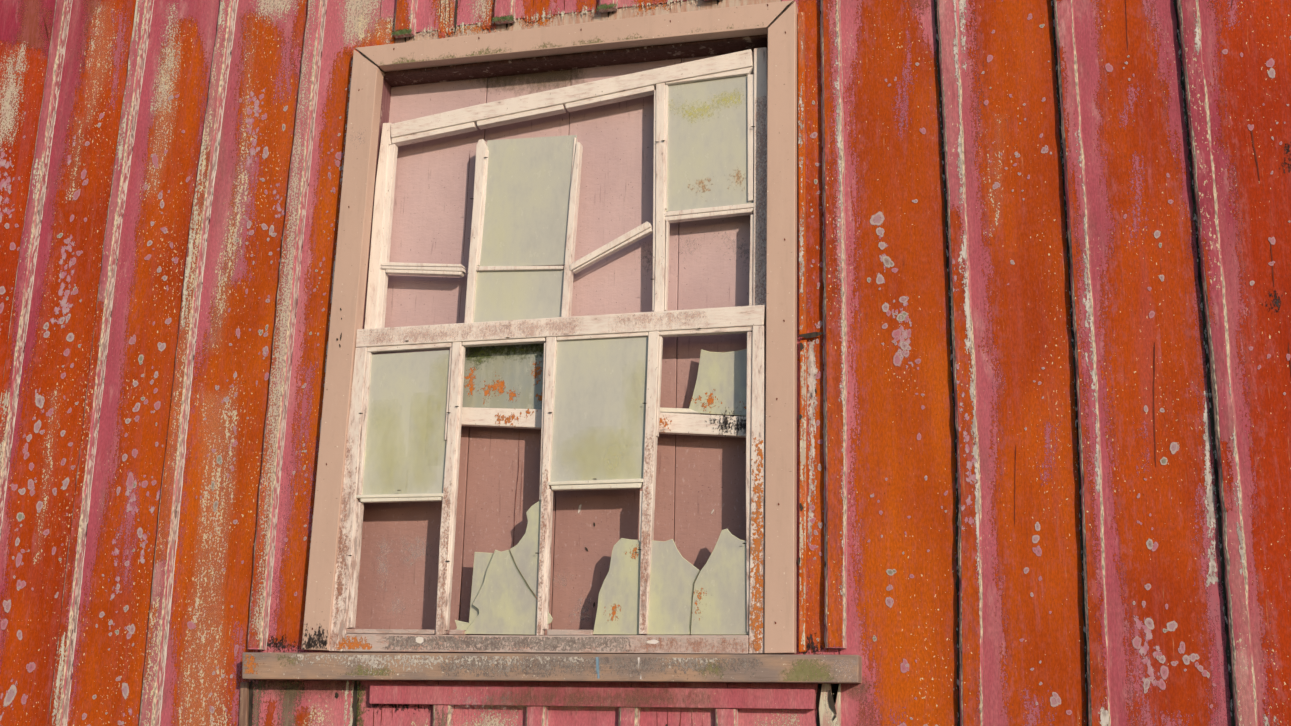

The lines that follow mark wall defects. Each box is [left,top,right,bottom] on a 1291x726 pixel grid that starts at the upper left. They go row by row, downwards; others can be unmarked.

peeling [623,0,693,15]
peeling [755,104,767,220]
peeling [0,0,599,726]
peeling [797,0,1291,726]
water stain [705,408,746,436]
corrosion [244,654,264,674]